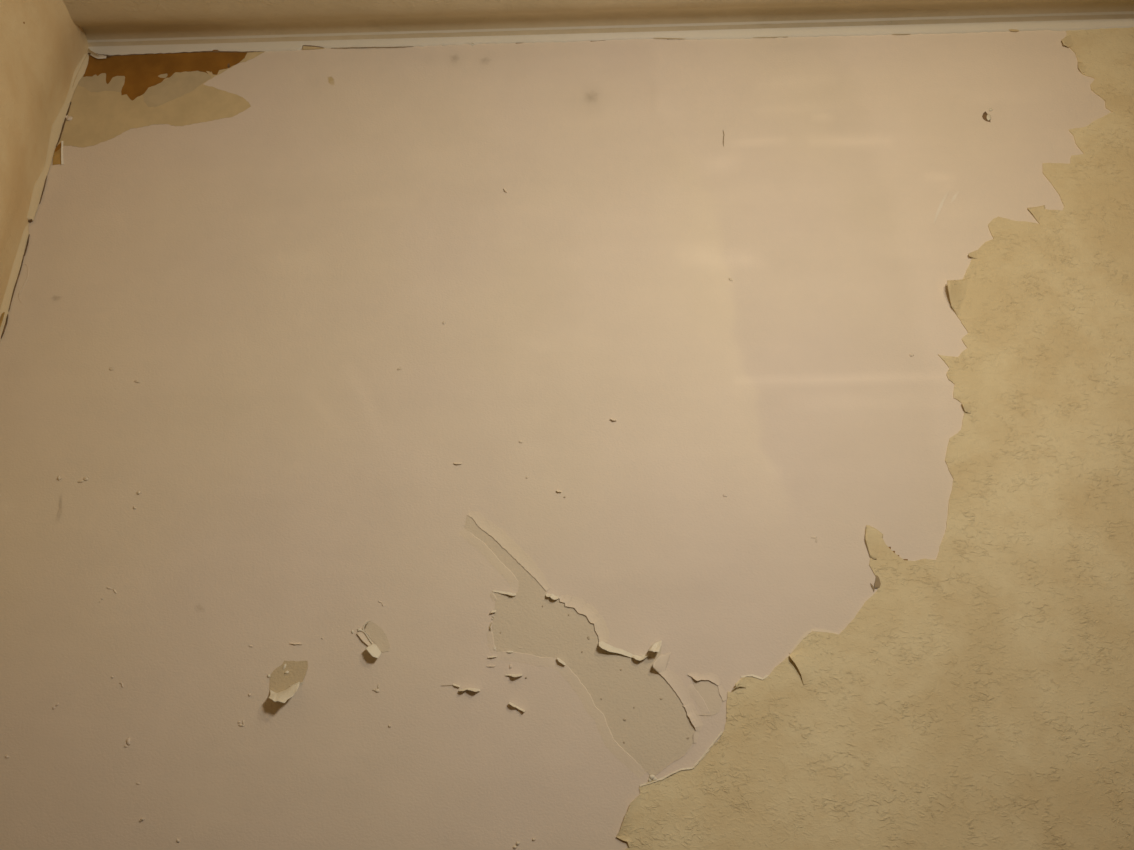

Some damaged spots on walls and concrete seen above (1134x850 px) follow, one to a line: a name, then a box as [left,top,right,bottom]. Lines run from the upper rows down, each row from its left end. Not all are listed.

peeling [57,48,265,147]
peeling [947,277,970,315]
peeling [356,620,390,658]
peeling [267,660,308,703]